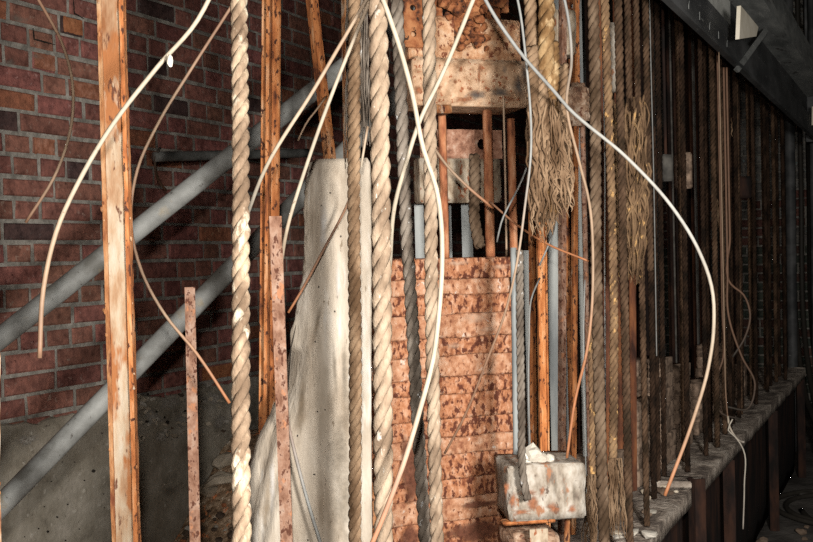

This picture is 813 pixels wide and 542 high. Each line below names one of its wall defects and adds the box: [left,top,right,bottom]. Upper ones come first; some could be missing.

corrosion [436,88,472,115]
corrosion [403,440,416,501]
corrosion [448,485,558,541]